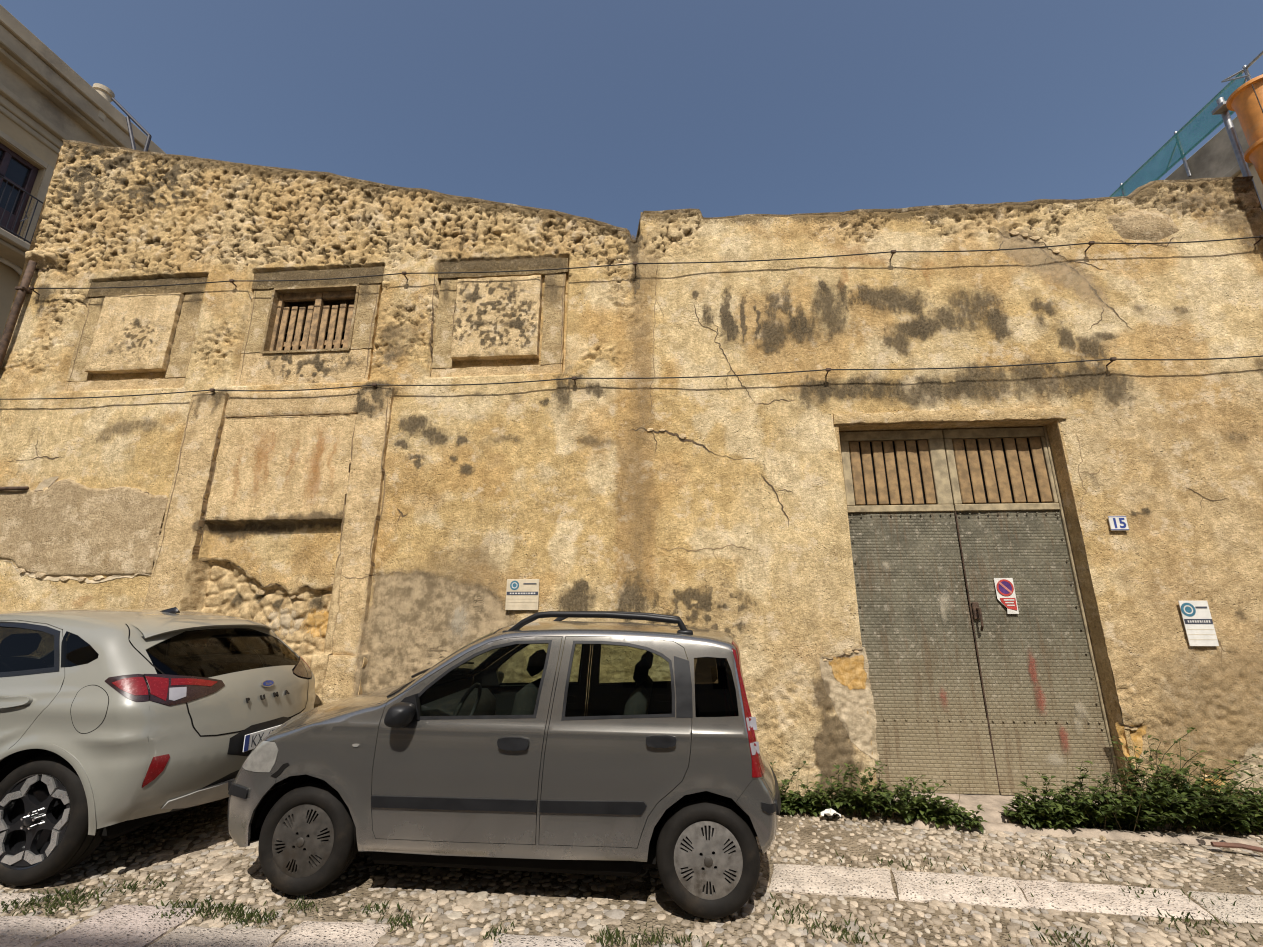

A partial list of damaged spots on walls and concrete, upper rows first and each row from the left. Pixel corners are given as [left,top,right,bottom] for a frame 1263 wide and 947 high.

water stain [720,288,807,353]
water stain [819,280,847,302]
water stain [908,302,923,316]
water stain [987,310,1010,341]
water stain [354,388,384,417]
crack [632,247,795,526]
spalling [178,557,343,705]
spalling [820,647,879,760]
spalling [1115,722,1147,759]
spalling [1200,742,1263,795]